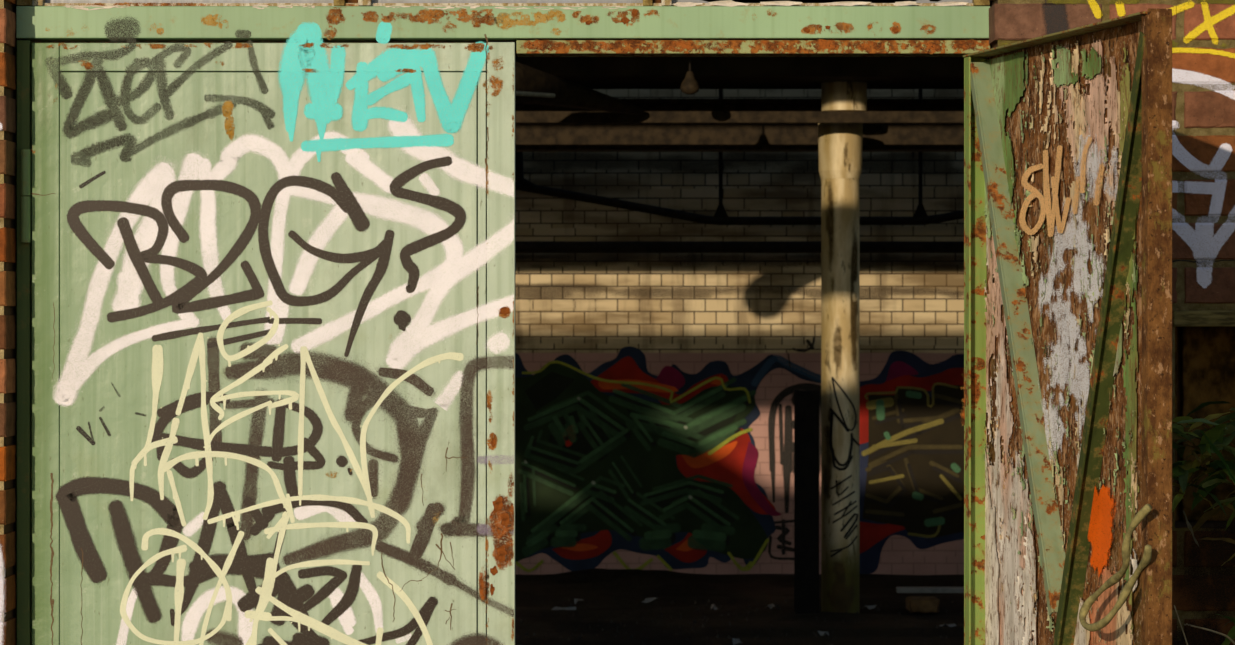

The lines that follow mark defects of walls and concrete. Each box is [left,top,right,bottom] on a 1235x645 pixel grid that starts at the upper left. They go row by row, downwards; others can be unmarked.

rust [70,2,239,30]
rust [298,3,732,116]
rust [801,22,902,52]
rust [917,24,987,54]
peeling [985,35,1132,552]
rust [961,356,986,425]
peeling [1074,208,1139,645]
rust [478,392,514,645]
spalling [1,618,16,645]